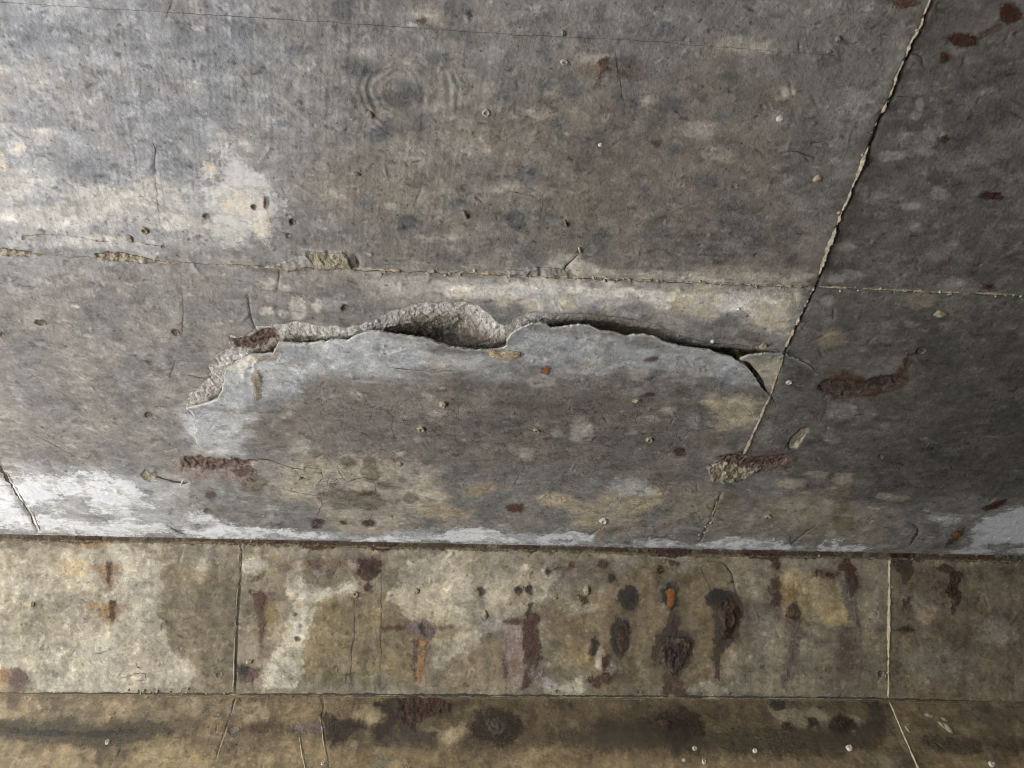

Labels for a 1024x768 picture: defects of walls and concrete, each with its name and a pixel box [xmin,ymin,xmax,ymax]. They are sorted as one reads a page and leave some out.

spalling [186,301,818,475]
corrosion [169,453,253,482]
damp [0,470,613,547]
damp [634,536,869,552]
damp [951,506,1024,555]
damp [514,567,561,617]
corrosion [502,613,543,689]
corrosion [587,617,631,689]
corrosion [645,548,706,753]
corrosion [705,589,744,681]
damp [0,716,173,766]
damp [549,700,887,758]